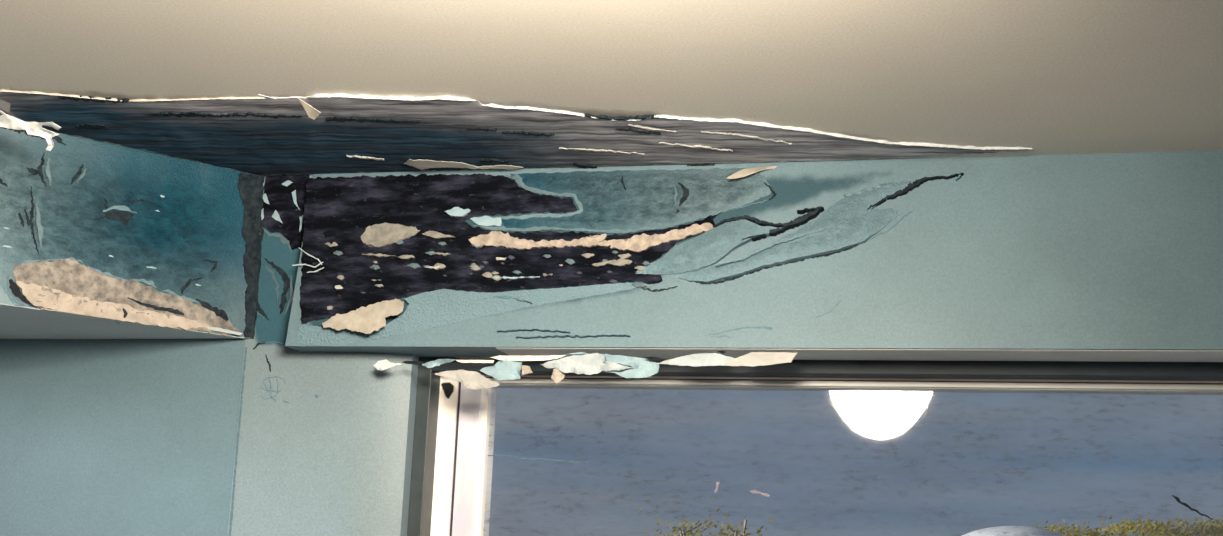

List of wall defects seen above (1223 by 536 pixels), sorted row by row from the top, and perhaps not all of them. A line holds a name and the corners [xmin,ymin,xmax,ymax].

crack [1,127,66,254]
peeling [0,89,1033,346]
peeling [374,351,797,390]